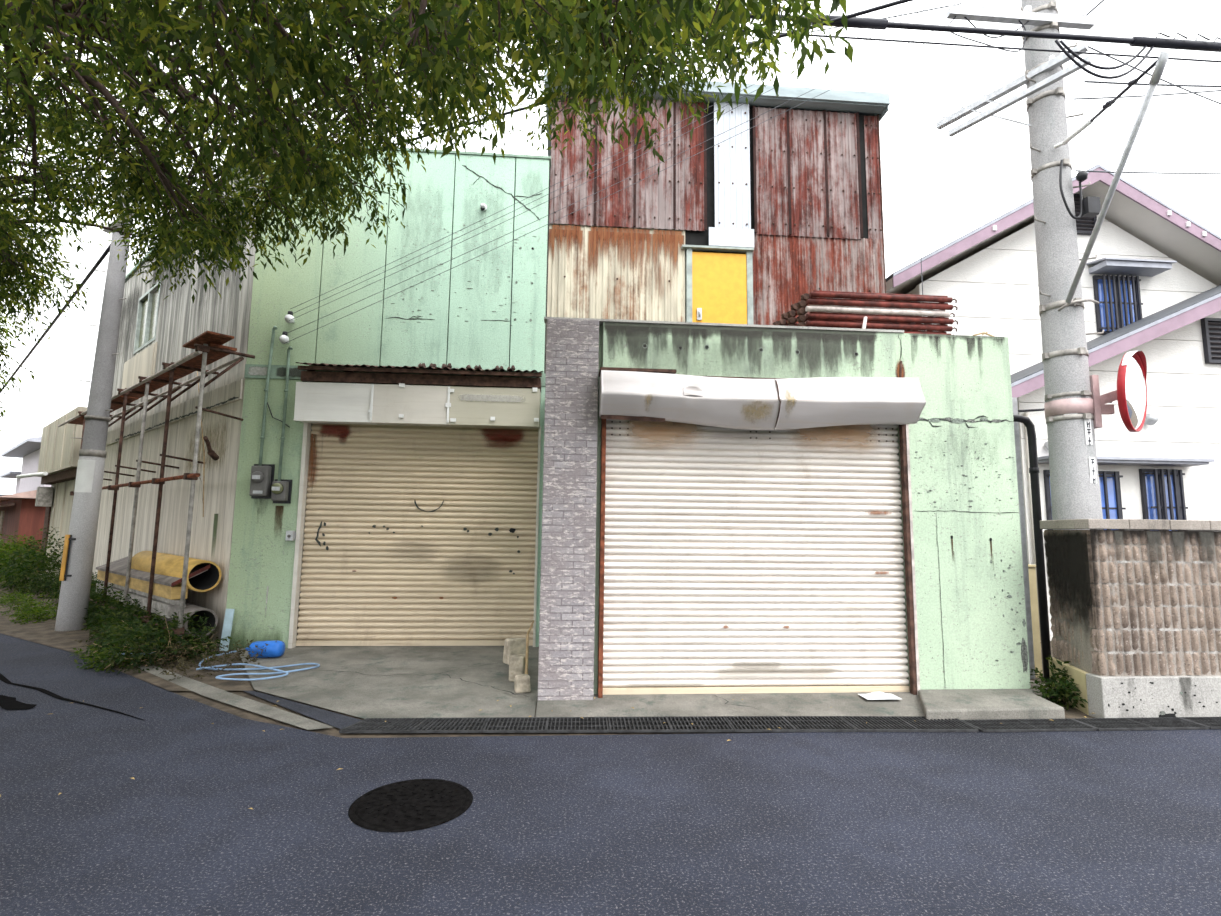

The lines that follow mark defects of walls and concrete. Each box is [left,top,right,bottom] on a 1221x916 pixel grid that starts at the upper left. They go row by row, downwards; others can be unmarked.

crack [462,165,542,219]
rust [549,225,684,293]
water stain [605,322,876,371]
water stain [910,333,1004,354]
rust [308,425,350,484]
rust [482,429,523,446]
crack [918,415,1014,428]
water stain [1044,529,1221,631]